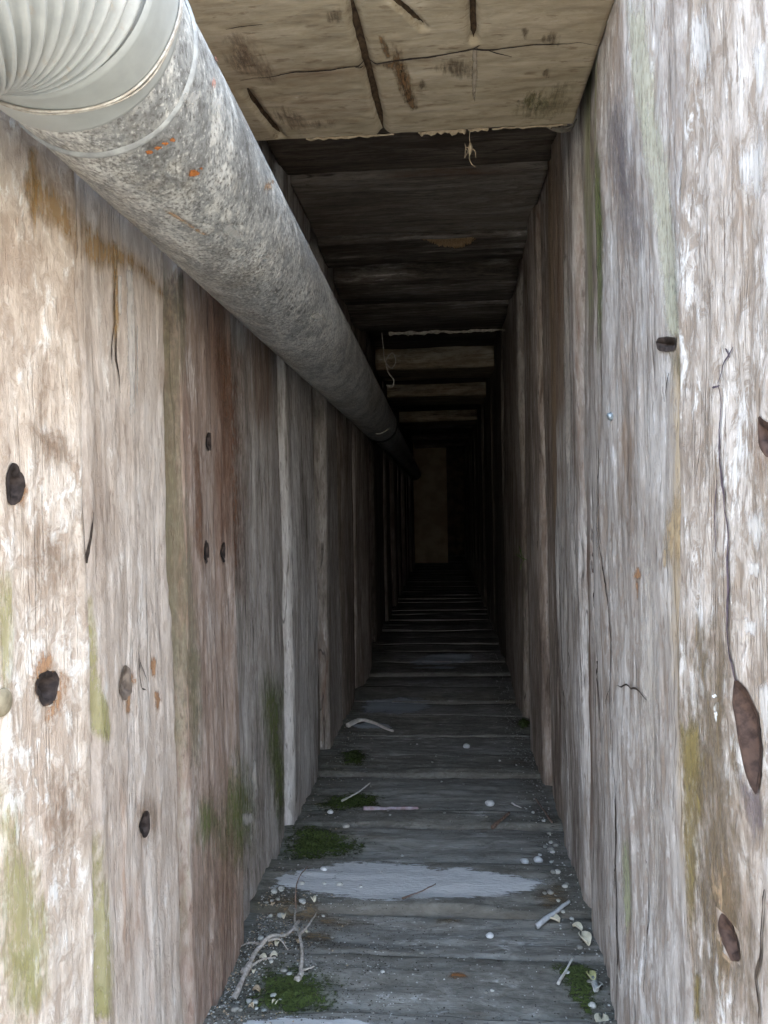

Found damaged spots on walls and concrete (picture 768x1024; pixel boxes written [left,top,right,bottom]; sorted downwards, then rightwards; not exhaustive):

crack [241,42,597,81]
leakage [26,150,163,337]
crack [111,257,120,384]
crack [712,347,737,681]
crack [592,499,649,1008]